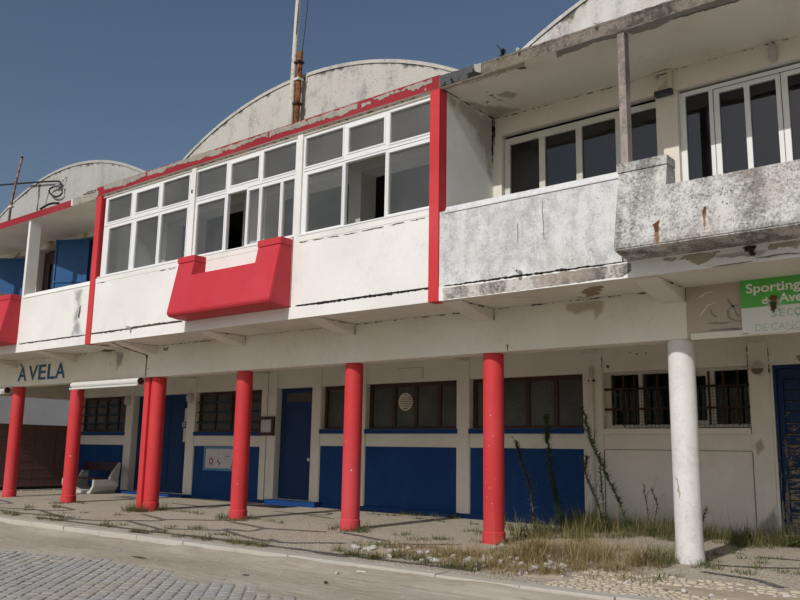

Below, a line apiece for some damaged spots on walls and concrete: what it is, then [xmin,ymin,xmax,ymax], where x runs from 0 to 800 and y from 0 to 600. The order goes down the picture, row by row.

peeling [71,78,433,206]
peeling [663,241,798,267]